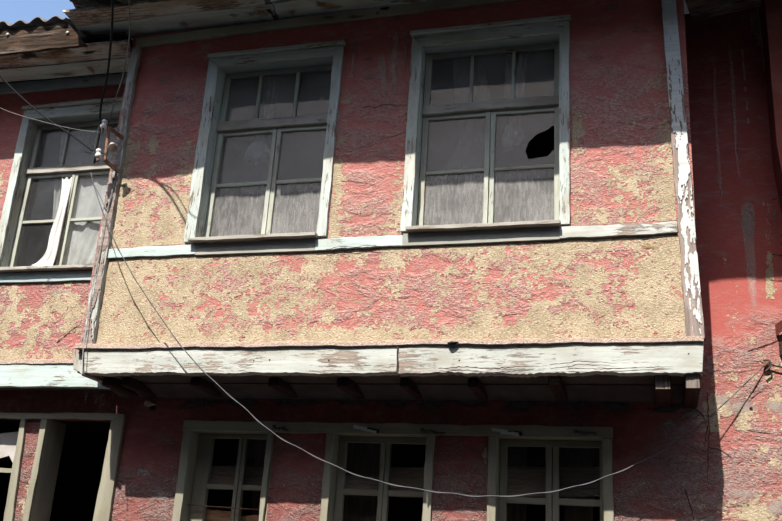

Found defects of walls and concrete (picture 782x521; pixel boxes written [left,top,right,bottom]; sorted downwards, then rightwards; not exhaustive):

peeling [0,0,703,360]
peeling [698,311,782,441]
peeling [674,480,782,521]
peeling [741,437,782,473]